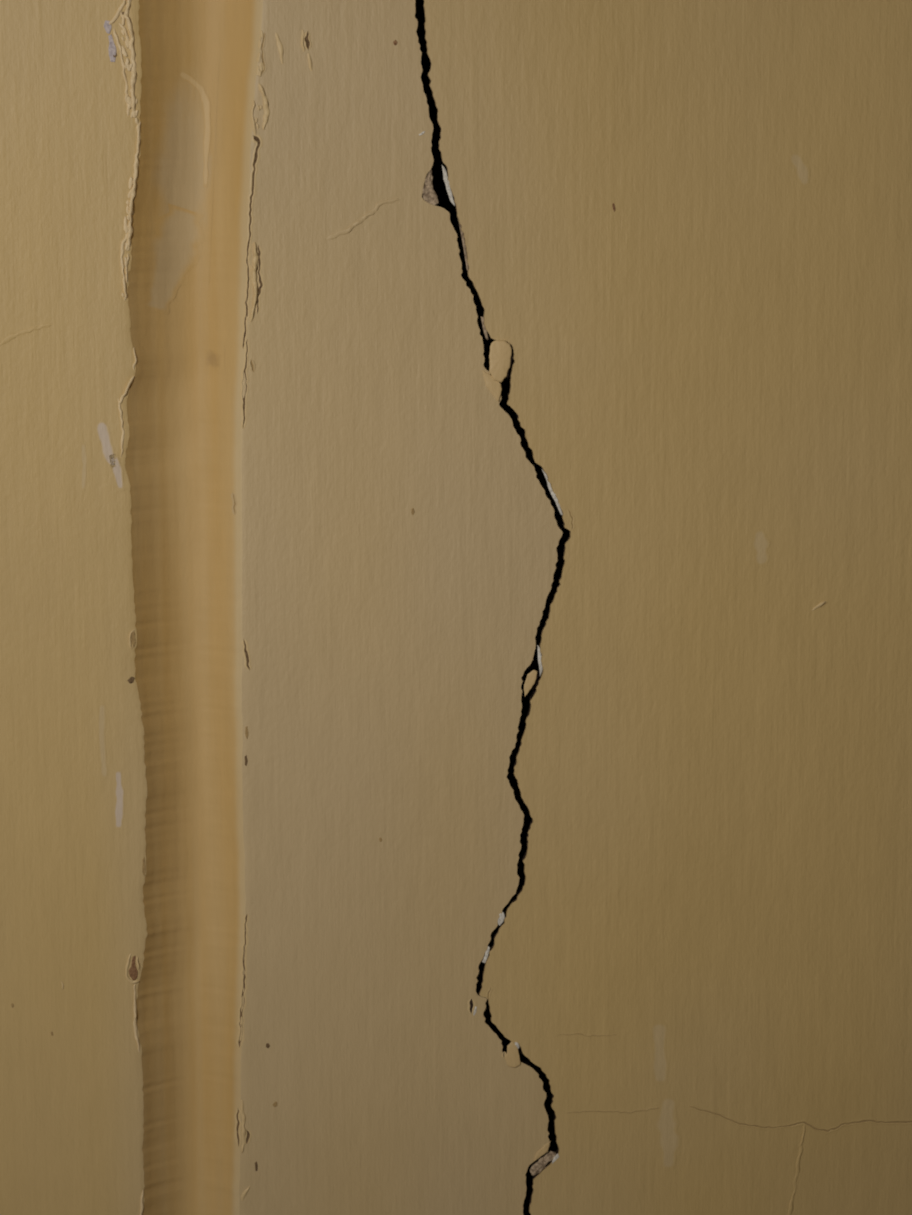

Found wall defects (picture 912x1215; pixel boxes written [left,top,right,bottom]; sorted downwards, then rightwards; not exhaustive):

peeling [104,0,141,300]
crack [415,0,575,1215]